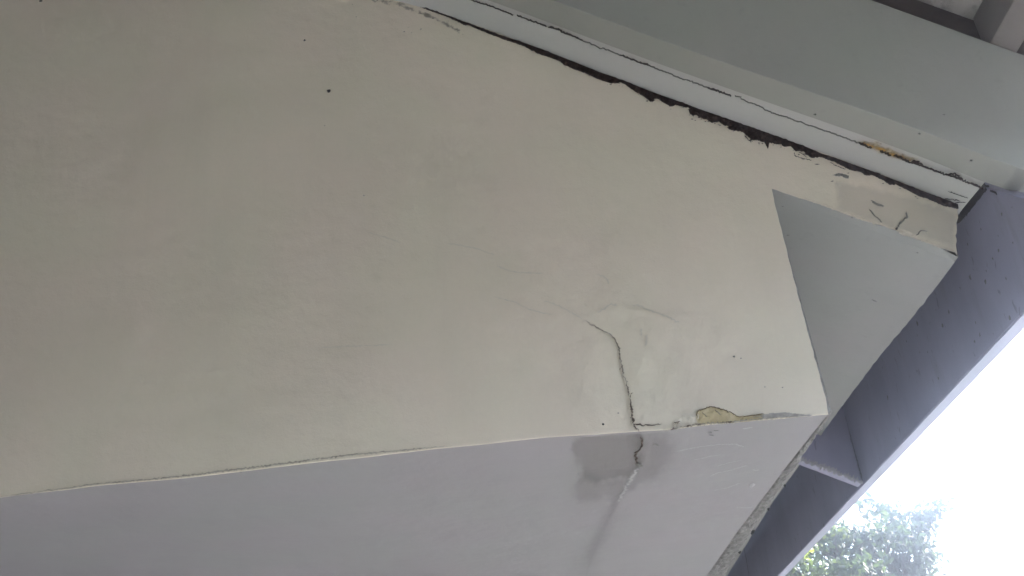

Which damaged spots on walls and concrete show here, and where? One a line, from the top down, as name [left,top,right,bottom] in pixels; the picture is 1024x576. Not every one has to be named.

crack [471,0,989,204]
crack [586,303,680,576]
spalling [662,406,812,431]